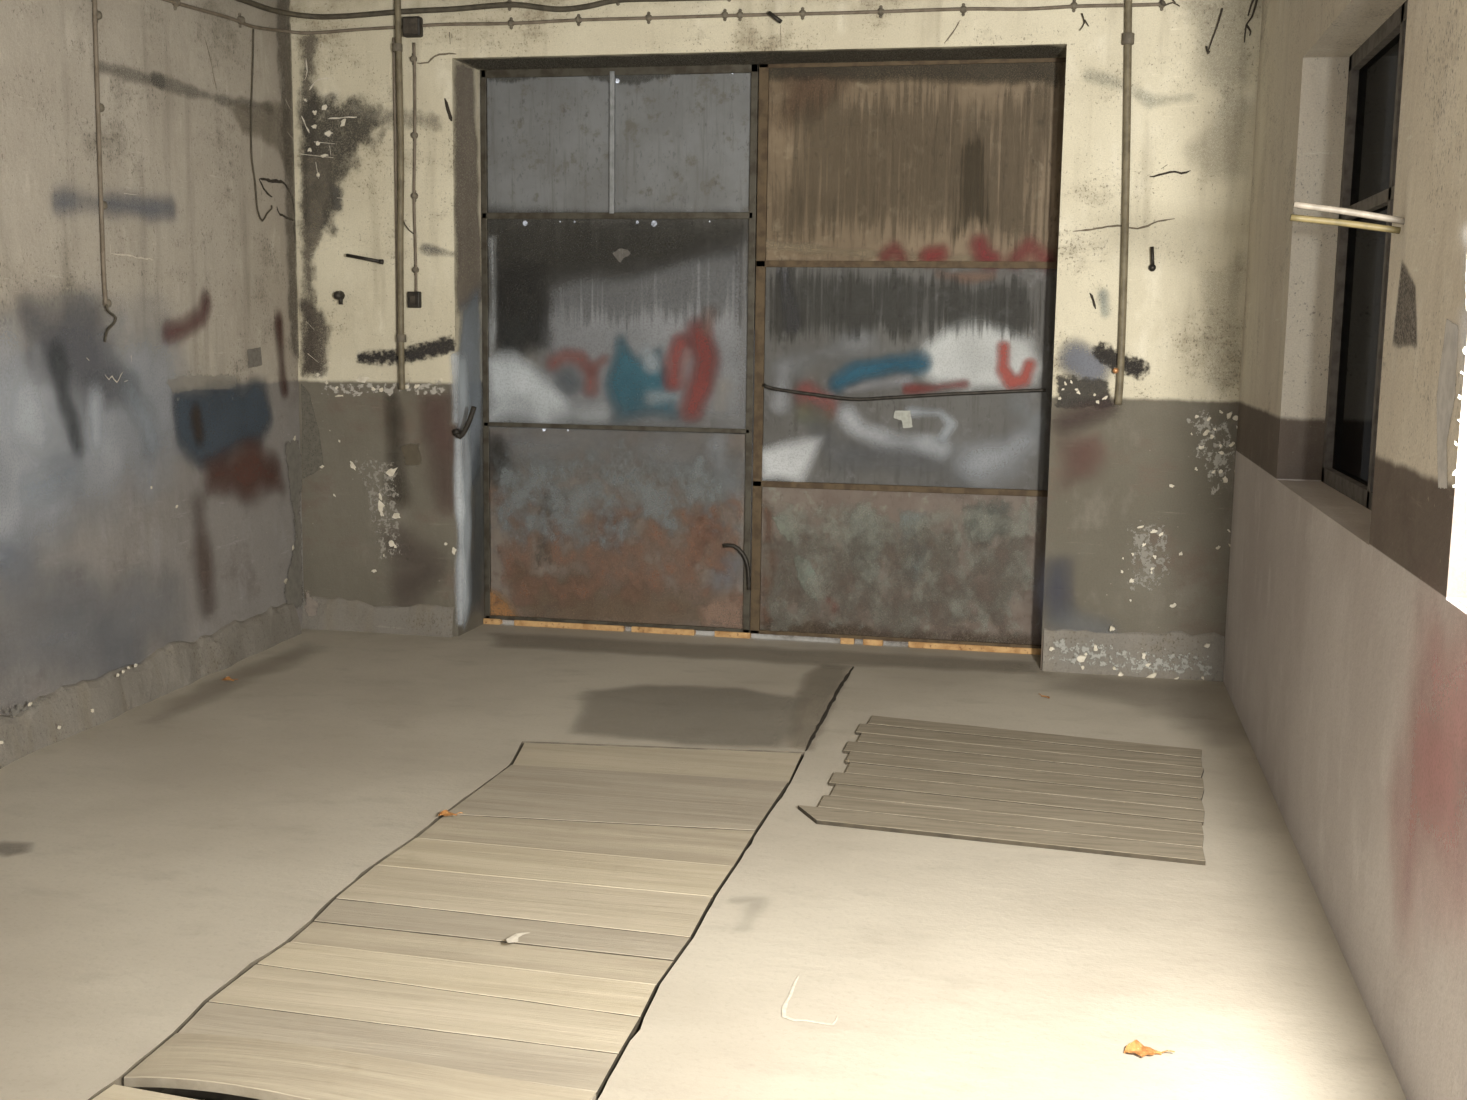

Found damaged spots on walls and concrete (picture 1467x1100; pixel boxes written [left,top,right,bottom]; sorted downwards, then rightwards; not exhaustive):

rust [490,592,515,616]
peeling [1049,626,1212,680]